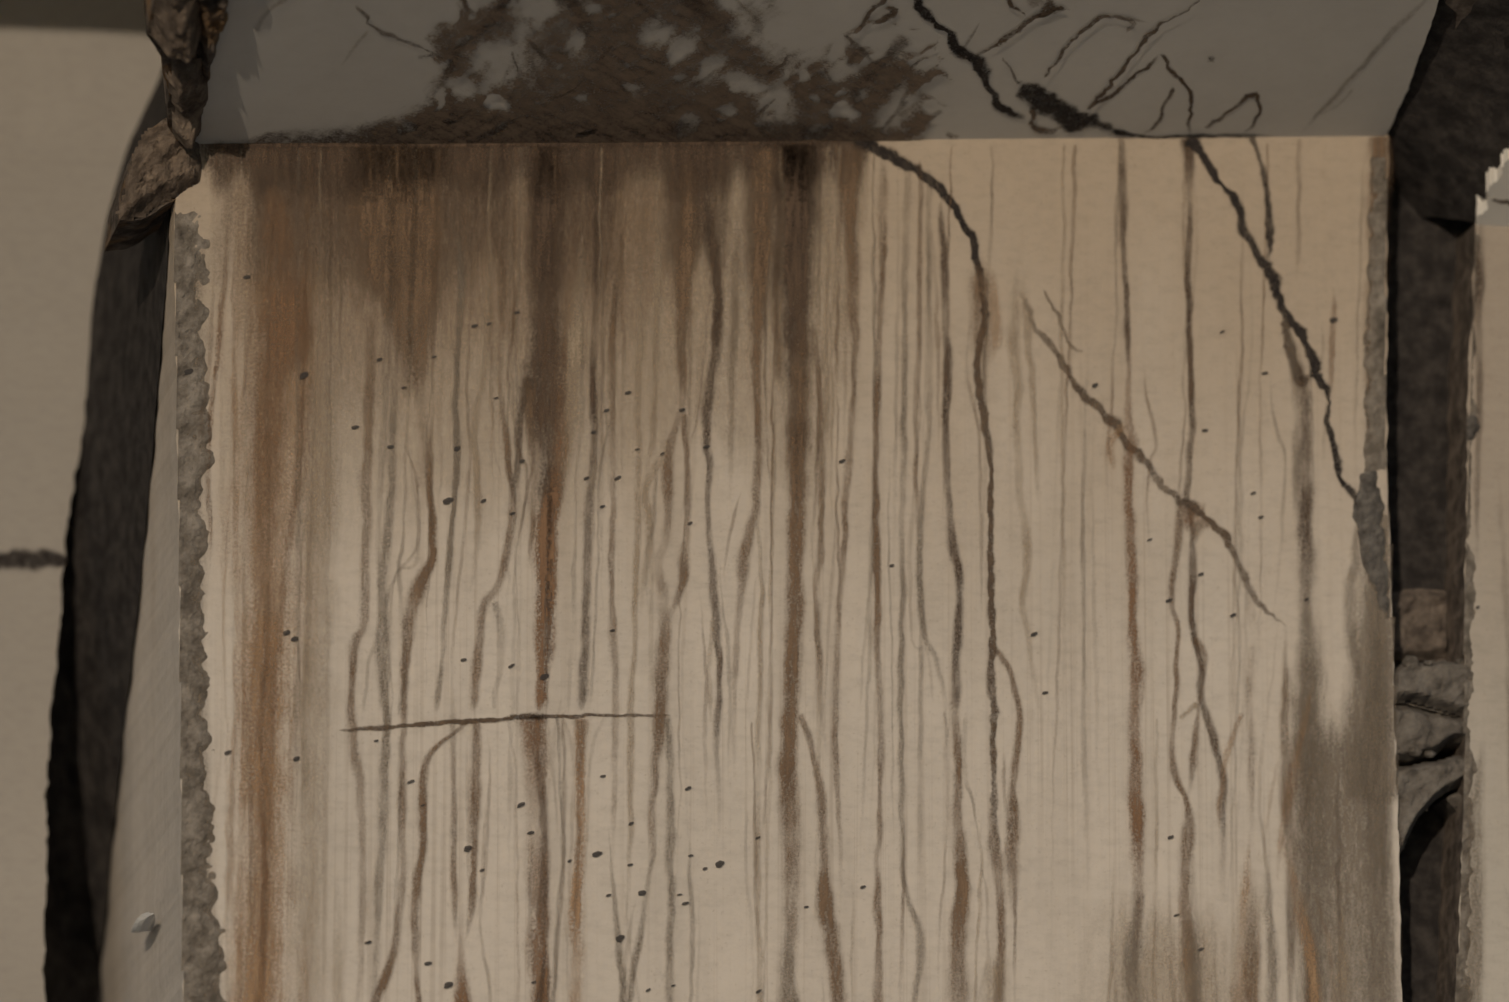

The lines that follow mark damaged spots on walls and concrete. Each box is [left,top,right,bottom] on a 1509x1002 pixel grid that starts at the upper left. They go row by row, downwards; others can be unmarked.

spalling [104,0,232,1002]
crack [348,713,654,732]
leakage [199,0,951,1002]
crack [824,124,1022,1002]
leakage [951,724,970,997]
crack [828,0,1357,558]
leakage [1116,434,1145,859]
crack [1042,334,1267,610]
leakage [1170,214,1227,898]
corrosion [1244,924,1258,1002]
spalling [1352,156,1393,621]
spalling [1455,229,1481,1002]